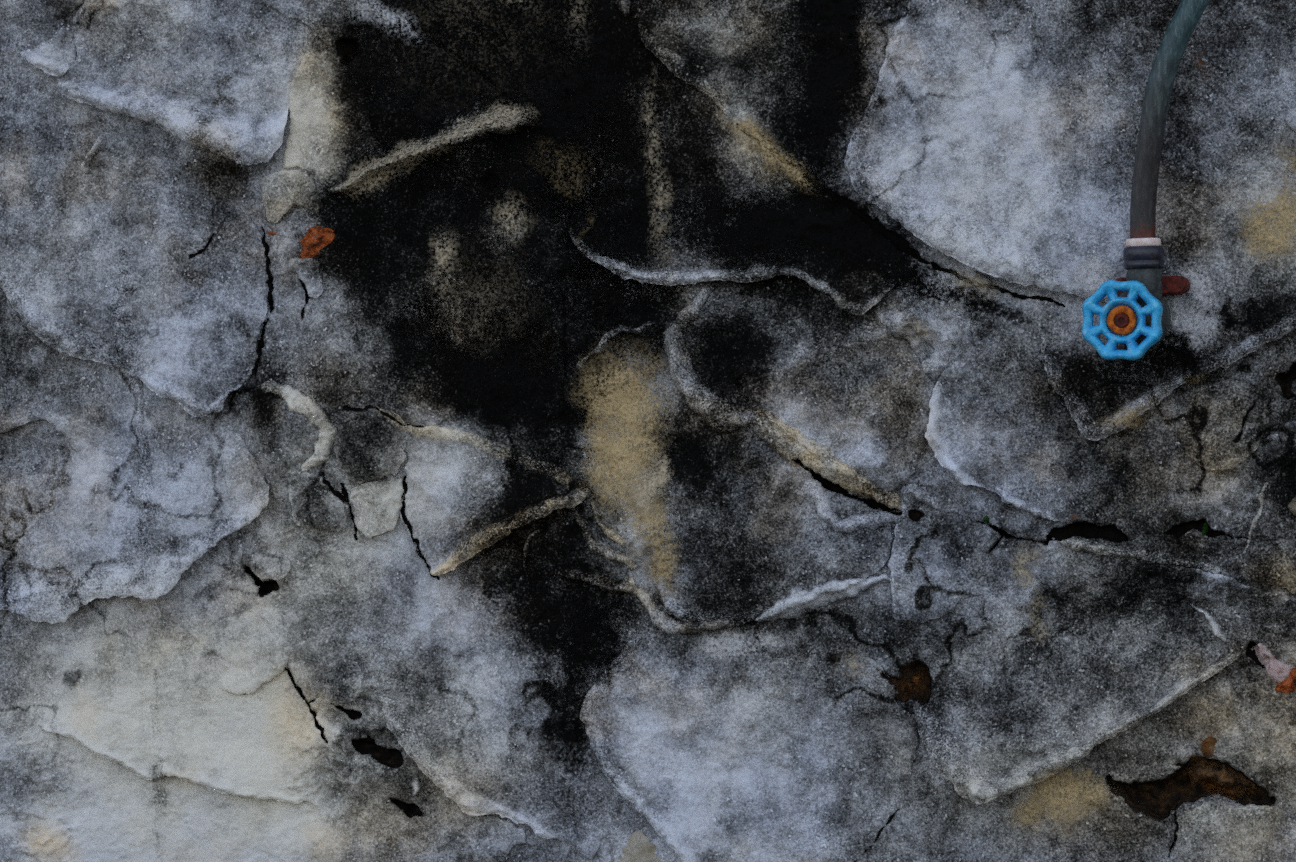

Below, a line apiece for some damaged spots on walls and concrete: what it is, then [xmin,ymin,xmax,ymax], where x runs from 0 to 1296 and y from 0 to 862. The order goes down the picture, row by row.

crack [189,233,215,259]
flaking render [0,0,534,624]
damp [336,0,1031,590]
flaking render [732,283,1296,523]
crack [285,667,328,743]
crack [400,476,439,580]
damp [477,561,626,798]
damp [695,628,785,661]
flaking render [834,535,1296,805]
flaking render [1078,756,1292,862]